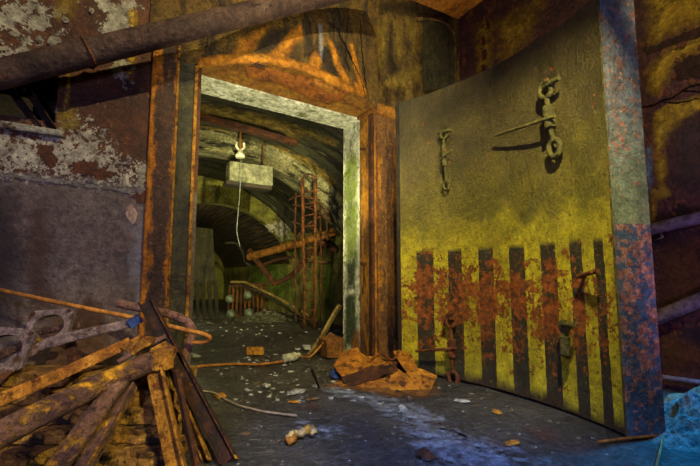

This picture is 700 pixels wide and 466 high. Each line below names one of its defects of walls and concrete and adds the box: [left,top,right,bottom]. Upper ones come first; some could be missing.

flaking render [0,0,82,57]
peeling [89,0,145,34]
peeling [99,56,137,90]
crack [330,21,368,98]
crack [642,83,700,108]
peeling [0,105,147,226]